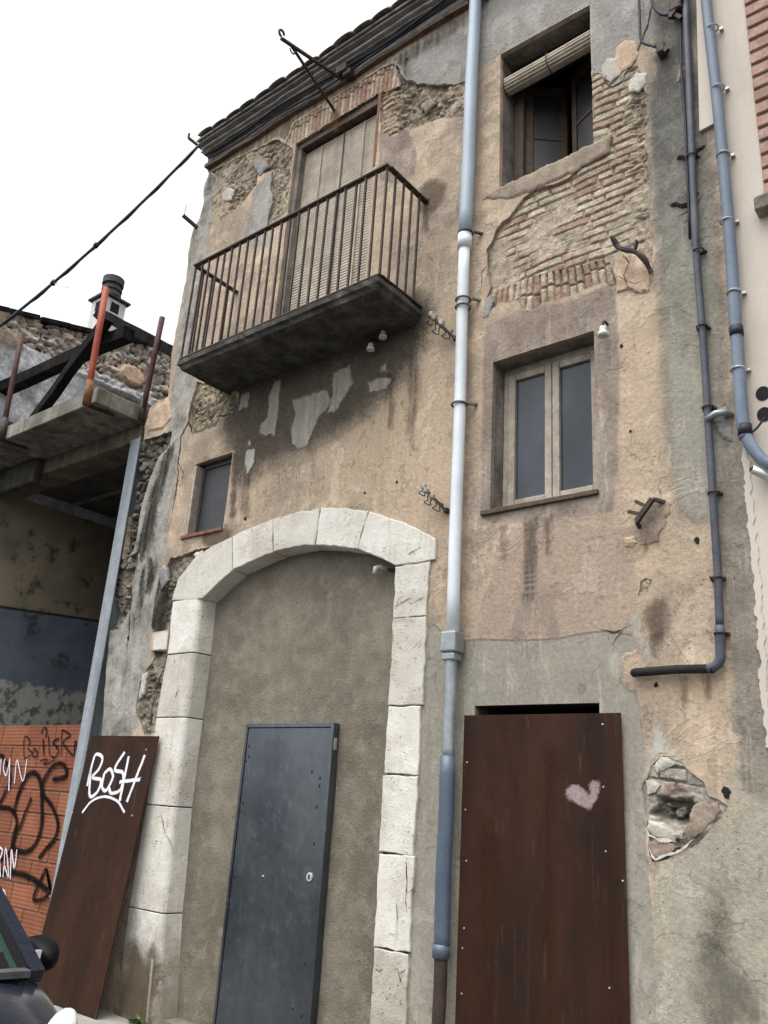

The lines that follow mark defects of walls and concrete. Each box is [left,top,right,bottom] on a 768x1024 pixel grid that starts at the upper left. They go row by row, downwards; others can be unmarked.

spalling [212,65,465,225]
spalling [483,40,653,318]
spalling [188,383,250,434]
peeling [260,379,281,436]
peeling [292,365,353,449]
peeling [368,364,391,392]
spalling [154,545,214,631]
water stain [631,600,664,664]
spalling [136,652,168,735]
spalling [643,724,727,862]